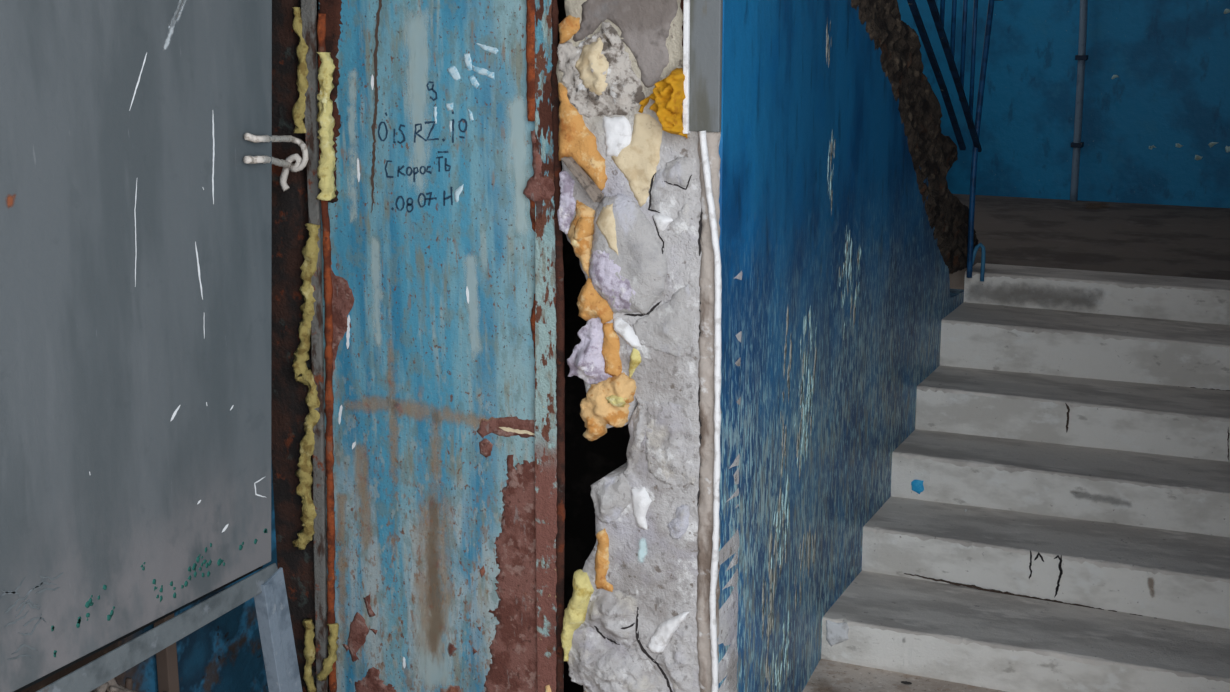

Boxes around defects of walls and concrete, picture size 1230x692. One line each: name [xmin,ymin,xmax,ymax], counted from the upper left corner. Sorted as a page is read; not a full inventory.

flaking render [573,0,684,88]
rust [317,0,343,203]
peeling [827,130,836,213]
spalling [851,0,979,274]
rust [324,261,355,390]
rust [523,0,565,692]
rust [477,416,535,458]
rust [472,454,538,692]
crack [904,550,1142,616]
rust [342,594,396,692]
crack [594,607,673,692]
flaking render [646,612,689,653]